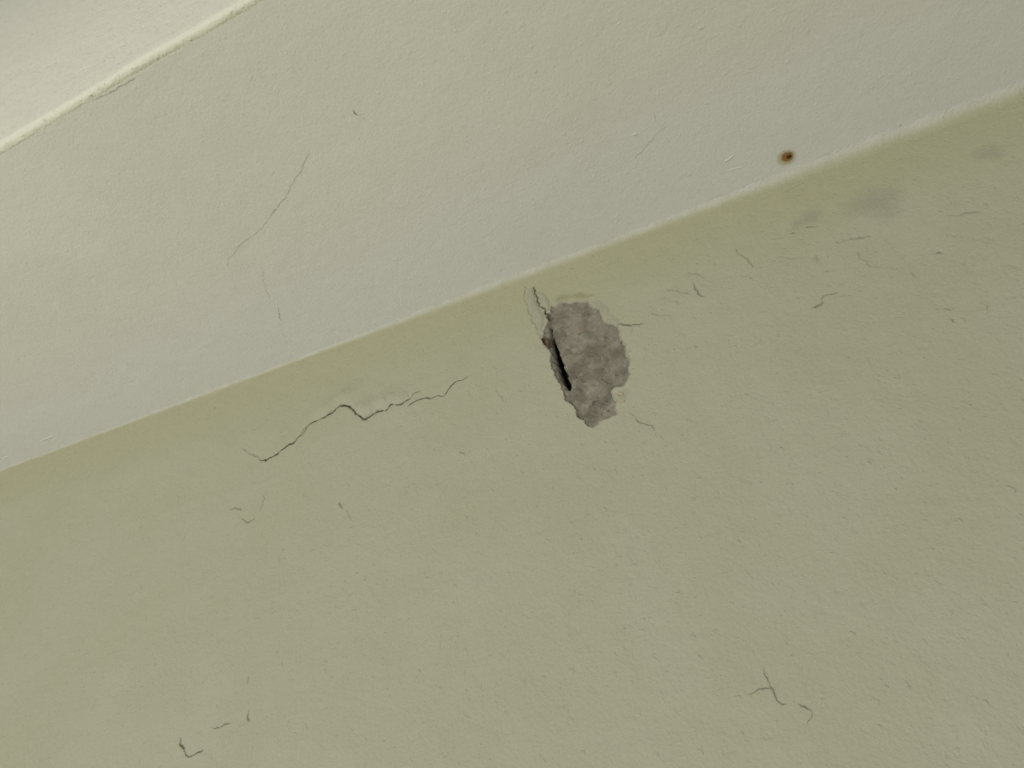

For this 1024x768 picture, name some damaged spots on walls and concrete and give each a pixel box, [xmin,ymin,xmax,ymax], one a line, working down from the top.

rust [780,152,793,162]
flaking render [527,289,631,429]
crack [262,377,467,461]